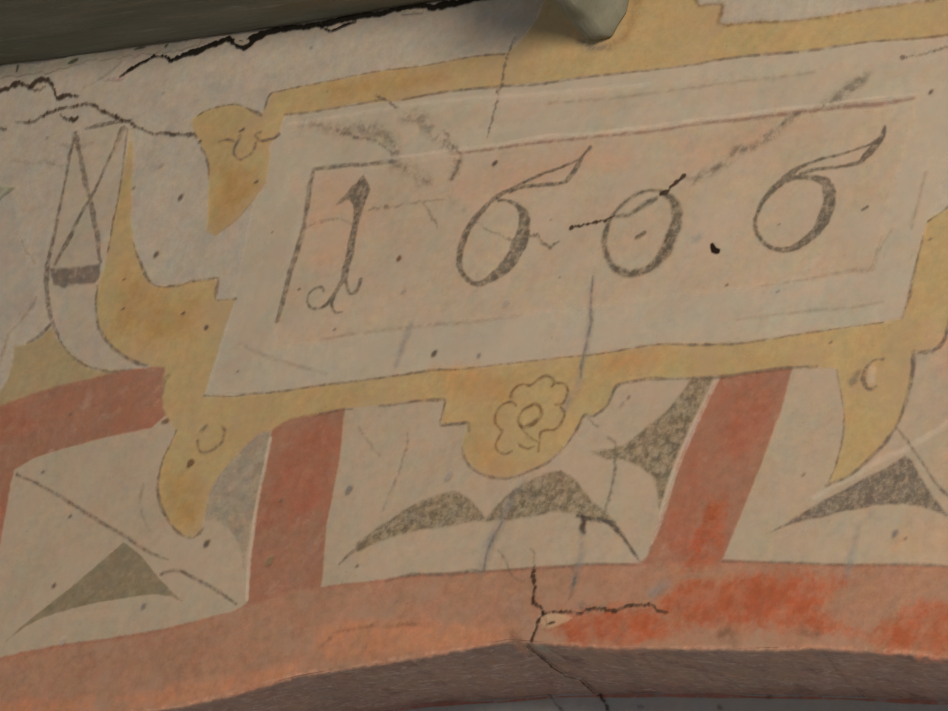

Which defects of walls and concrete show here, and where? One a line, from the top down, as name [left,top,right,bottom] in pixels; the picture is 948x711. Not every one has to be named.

crack [0,76,195,135]
crack [527,568,667,711]